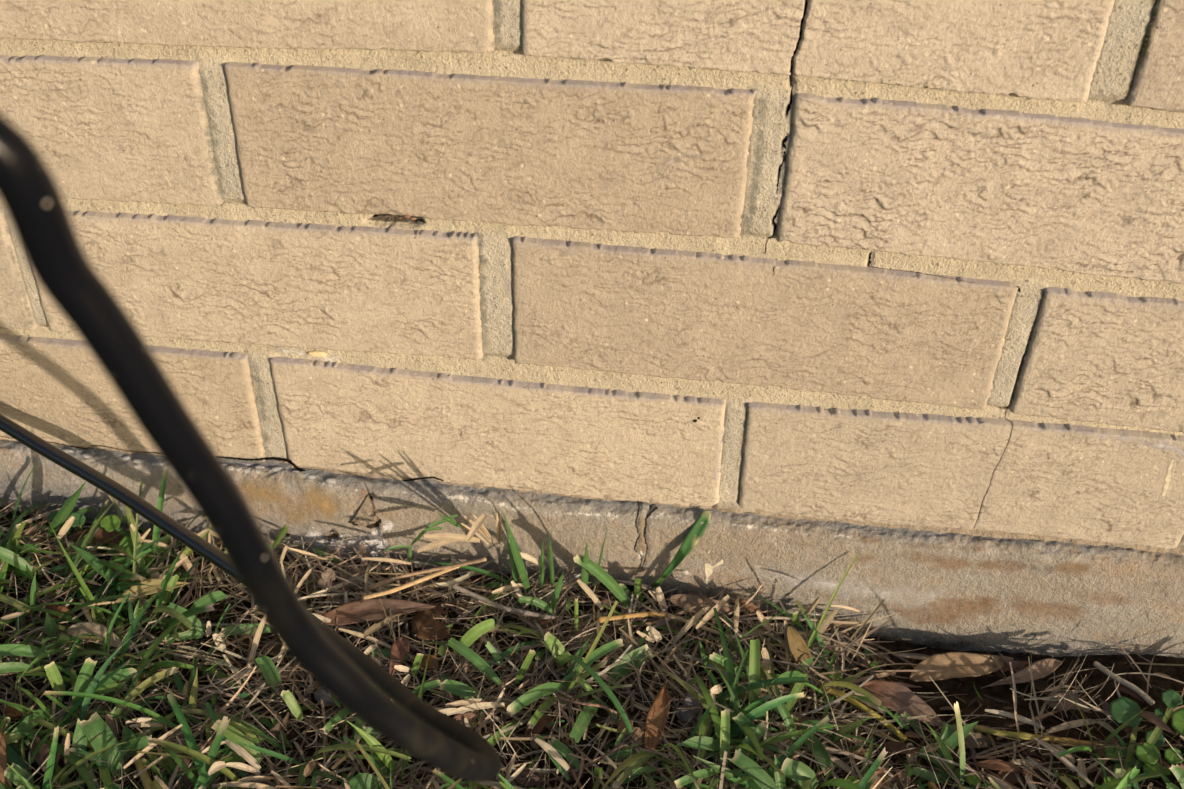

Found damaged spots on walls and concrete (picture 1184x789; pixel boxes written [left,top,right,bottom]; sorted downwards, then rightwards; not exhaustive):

crack [765,0,807,276]
crack [868,253,974,283]
crack [974,286,1045,529]
crack [634,501,658,576]